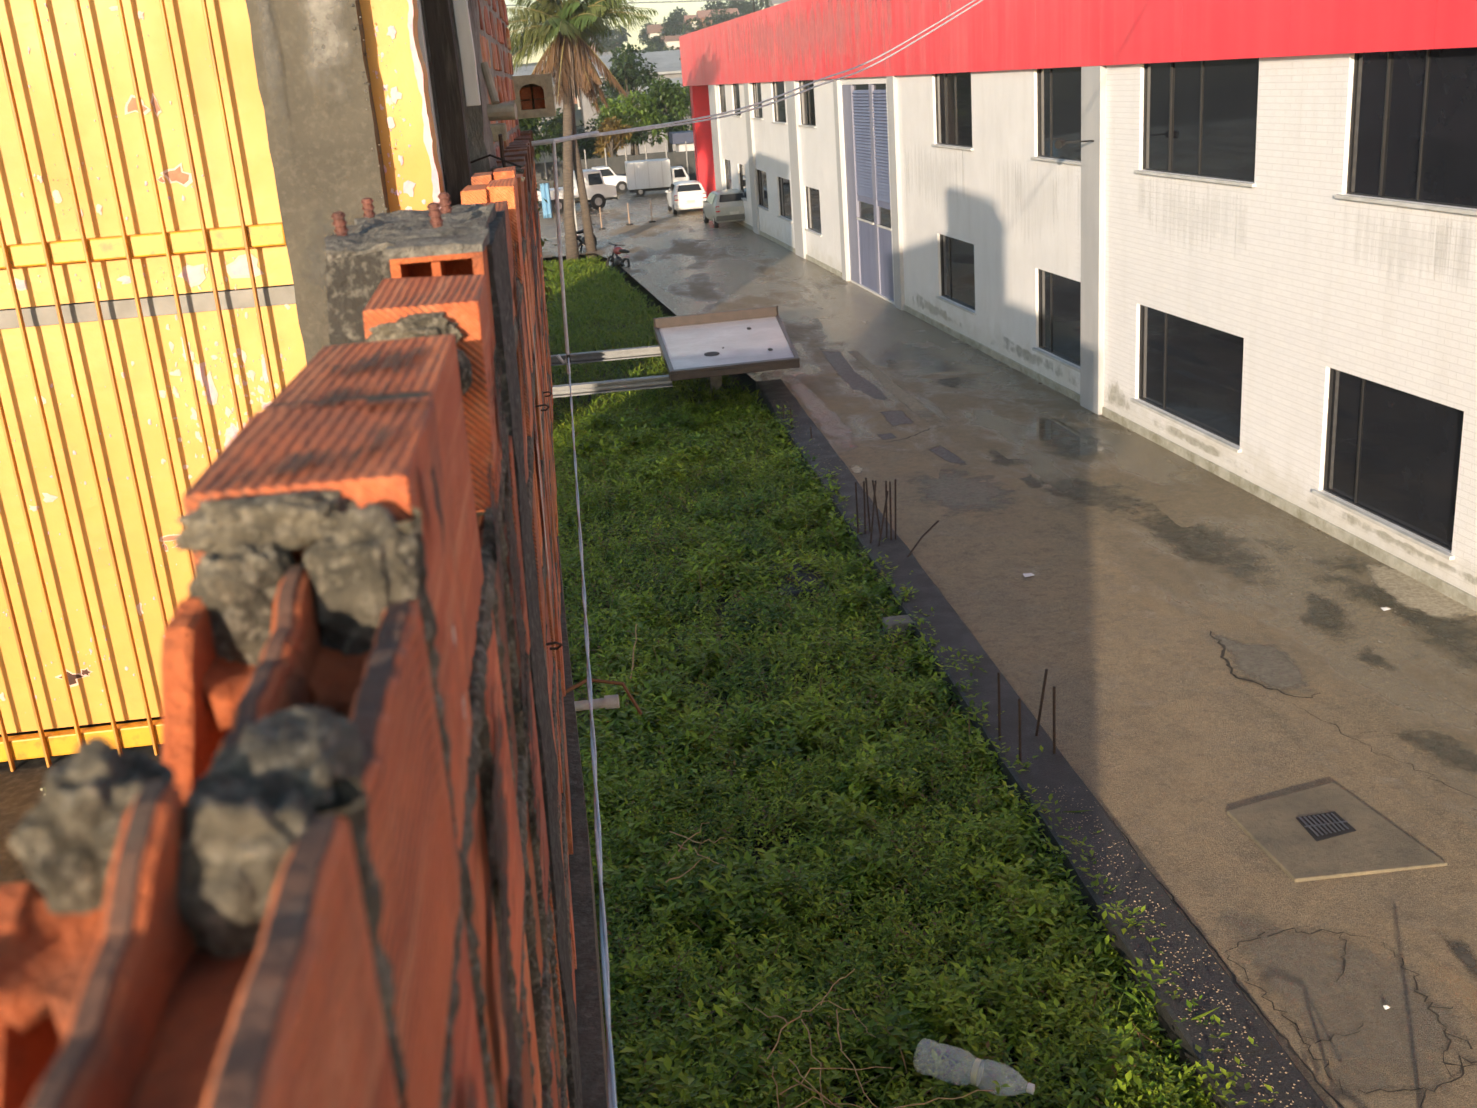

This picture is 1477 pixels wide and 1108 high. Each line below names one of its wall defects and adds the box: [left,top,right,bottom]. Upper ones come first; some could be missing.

peeling [111,93,188,118]
peeling [366,0,452,228]
peeling [12,164,106,237]
peeling [136,129,203,201]
peeling [9,275,42,291]
peeling [67,254,265,290]
peeling [146,308,290,480]
peeling [16,450,76,511]